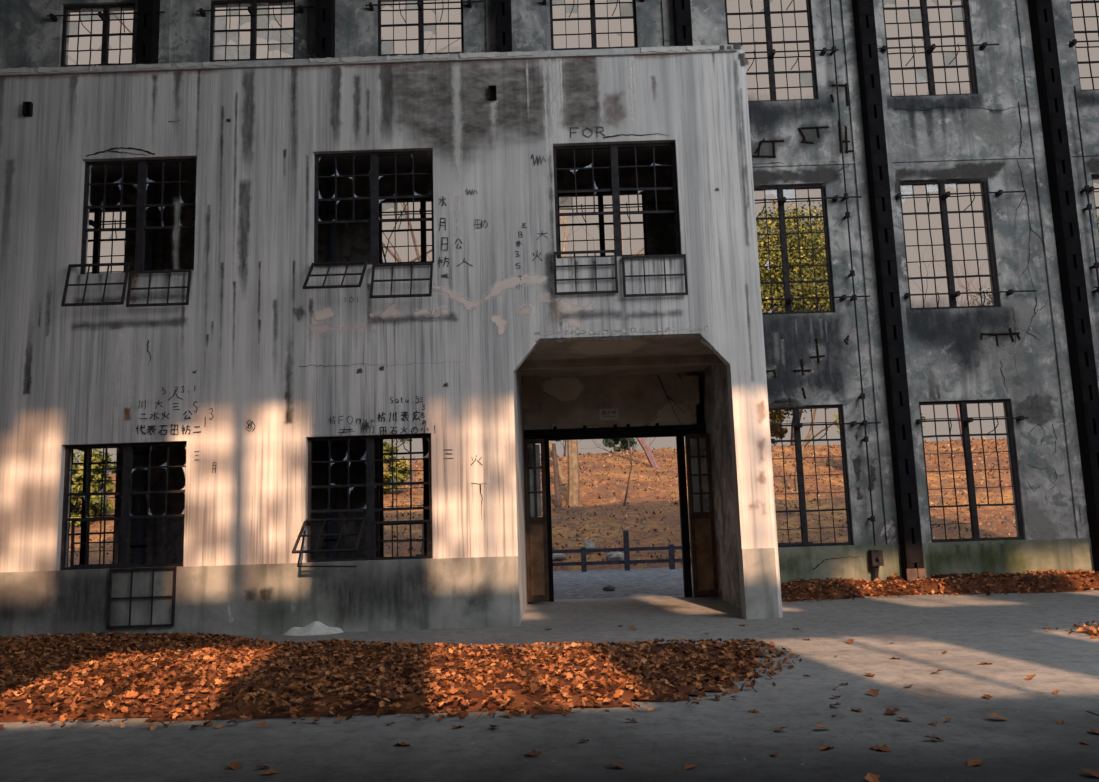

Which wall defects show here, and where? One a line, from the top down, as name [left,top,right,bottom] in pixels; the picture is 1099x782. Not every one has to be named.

leakage [222,73,253,150]
leakage [331,68,341,128]
leakage [378,58,619,305]
leakage [240,183,249,272]
leakage [369,314,457,323]
peeling [370,274,592,326]
peeling [540,335,648,355]